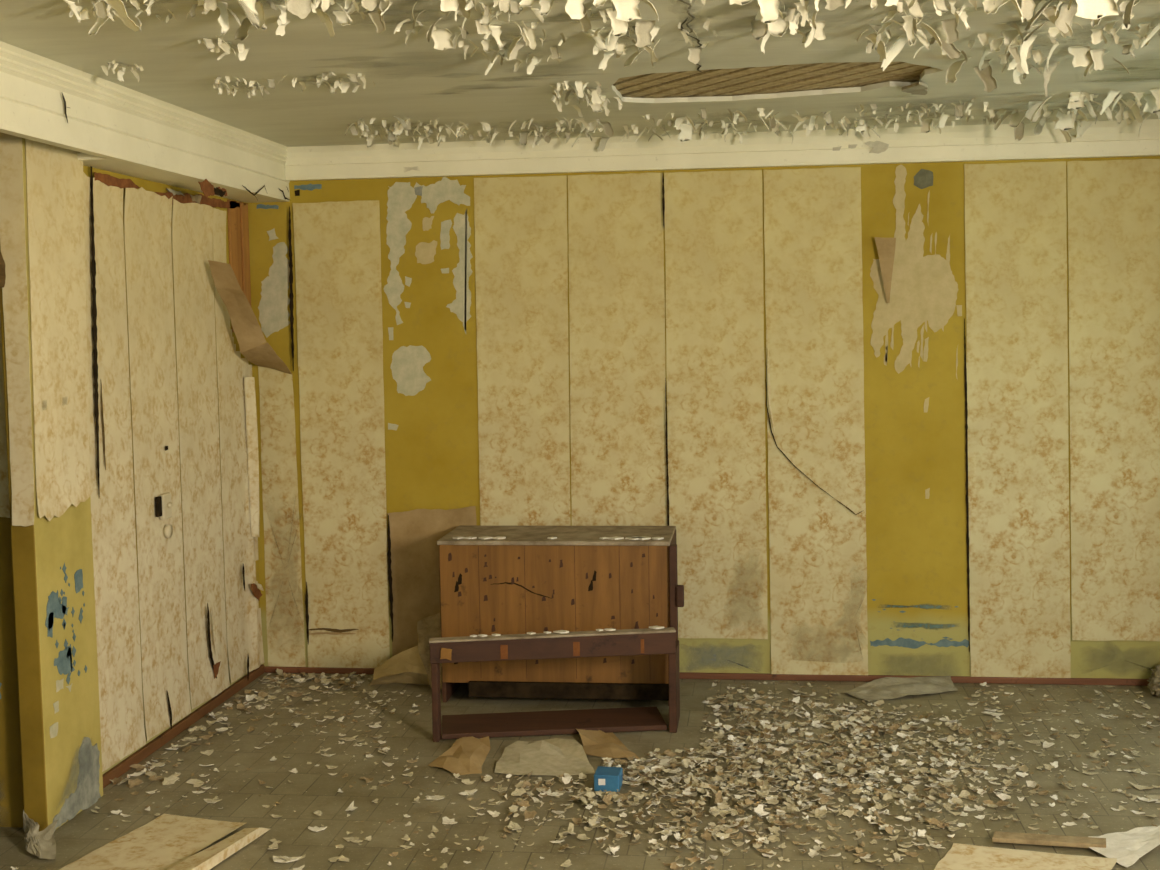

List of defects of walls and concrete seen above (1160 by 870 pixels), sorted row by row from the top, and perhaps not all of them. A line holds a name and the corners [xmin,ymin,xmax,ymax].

flaking render [63,0,1160,154]
crack [679,0,702,72]
spalling [198,179,227,197]
peeling [294,183,322,196]
peeling [258,229,290,337]
peeling [384,177,473,396]
peeling [870,164,962,374]
peeling [45,563,87,738]
spalling [53,737,101,832]